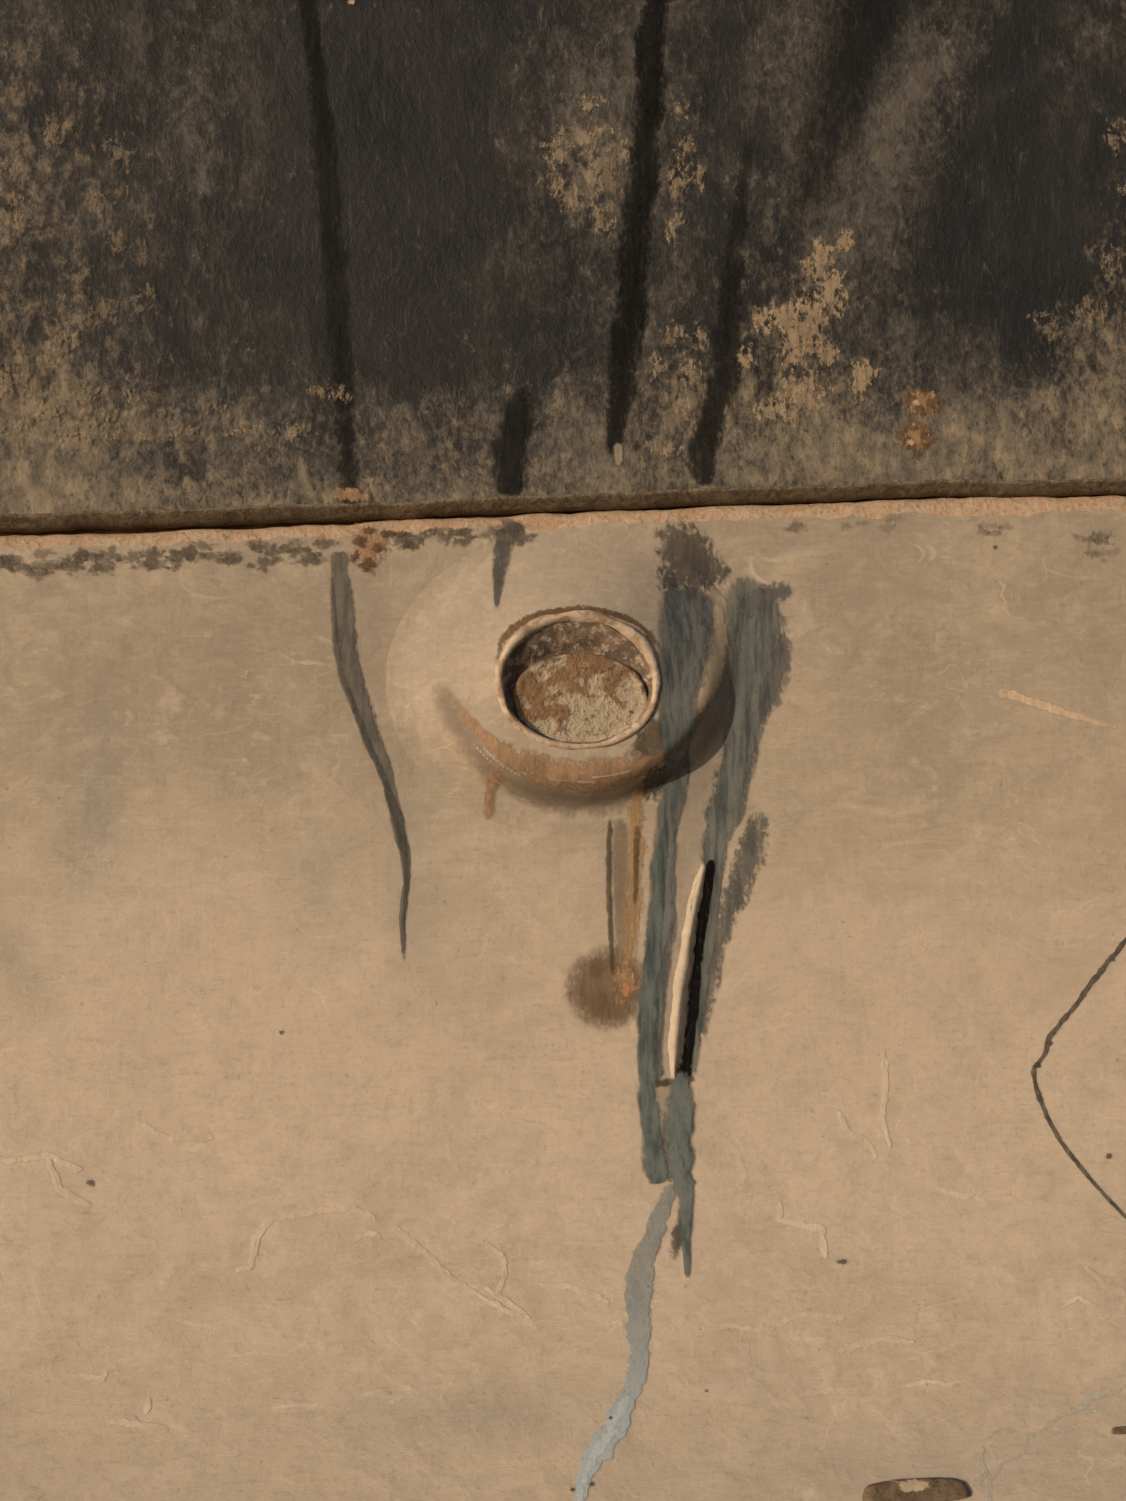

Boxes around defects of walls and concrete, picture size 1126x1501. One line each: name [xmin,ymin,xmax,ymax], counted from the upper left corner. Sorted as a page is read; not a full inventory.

damp [335,433,358,503]
damp [330,552,410,953]
damp [492,519,522,606]
damp [491,390,532,495]
corrosion [457,705,666,1026]
corrosion [497,605,658,652]
damp [606,0,672,465]
damp [570,523,791,1501]
crack [668,860,715,1085]
damp [688,209,747,485]
corrosion [900,387,943,456]
crack [1031,937,1126,1219]